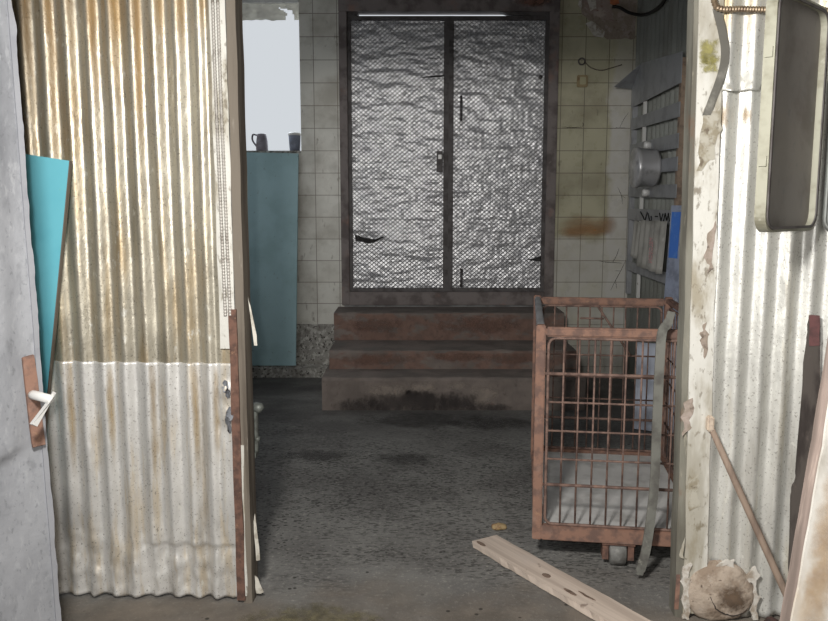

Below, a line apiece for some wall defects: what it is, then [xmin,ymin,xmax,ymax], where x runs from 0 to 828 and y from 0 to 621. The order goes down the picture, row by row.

spalling [578,0,637,40]
peeling [697,105,722,171]
peeling [704,221,717,273]
peeling [699,322,709,359]
leakage [344,392,522,427]
peeling [681,398,694,437]